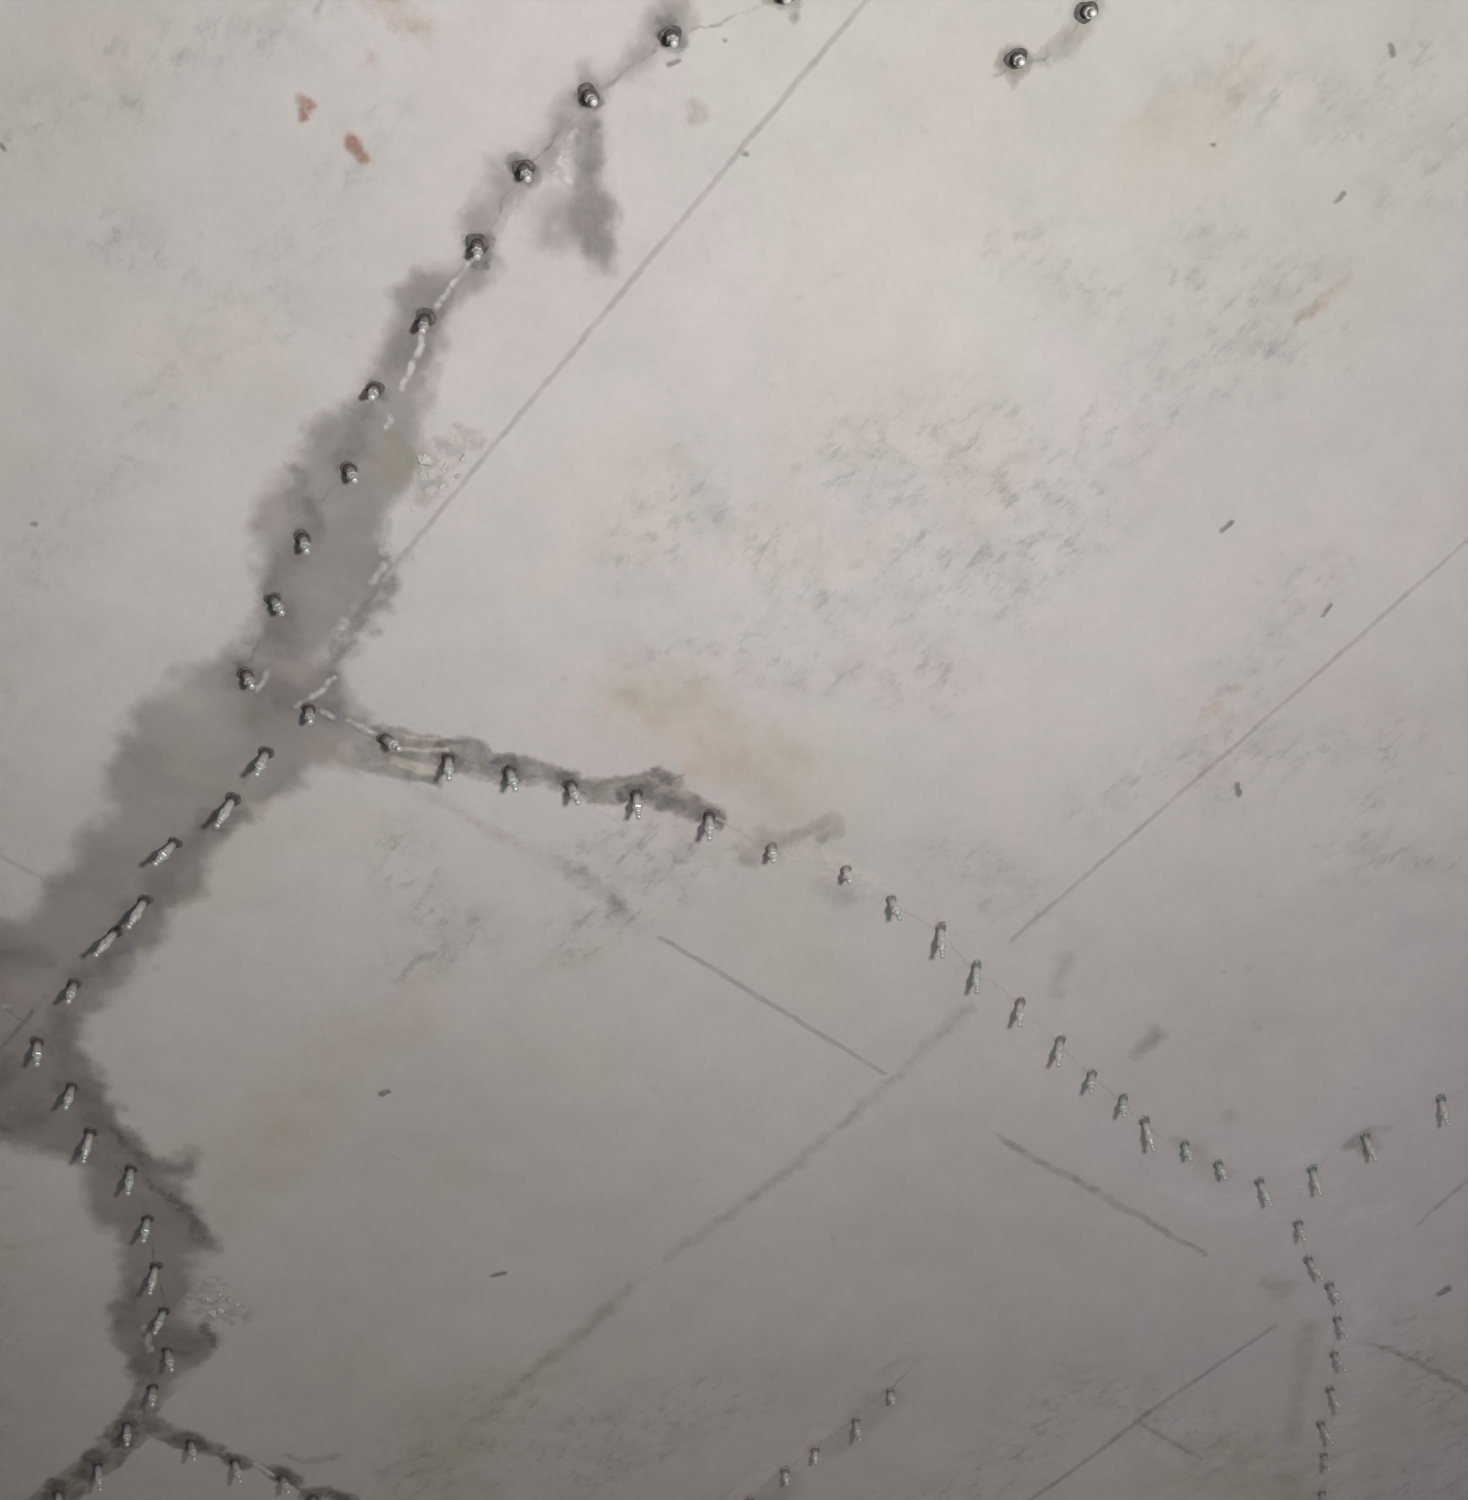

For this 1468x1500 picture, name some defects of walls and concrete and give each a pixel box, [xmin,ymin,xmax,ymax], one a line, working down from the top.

corrosion [297,95,317,122]
corrosion [346,134,370,163]
damp [0,0,804,1500]
damp [739,813,891,907]